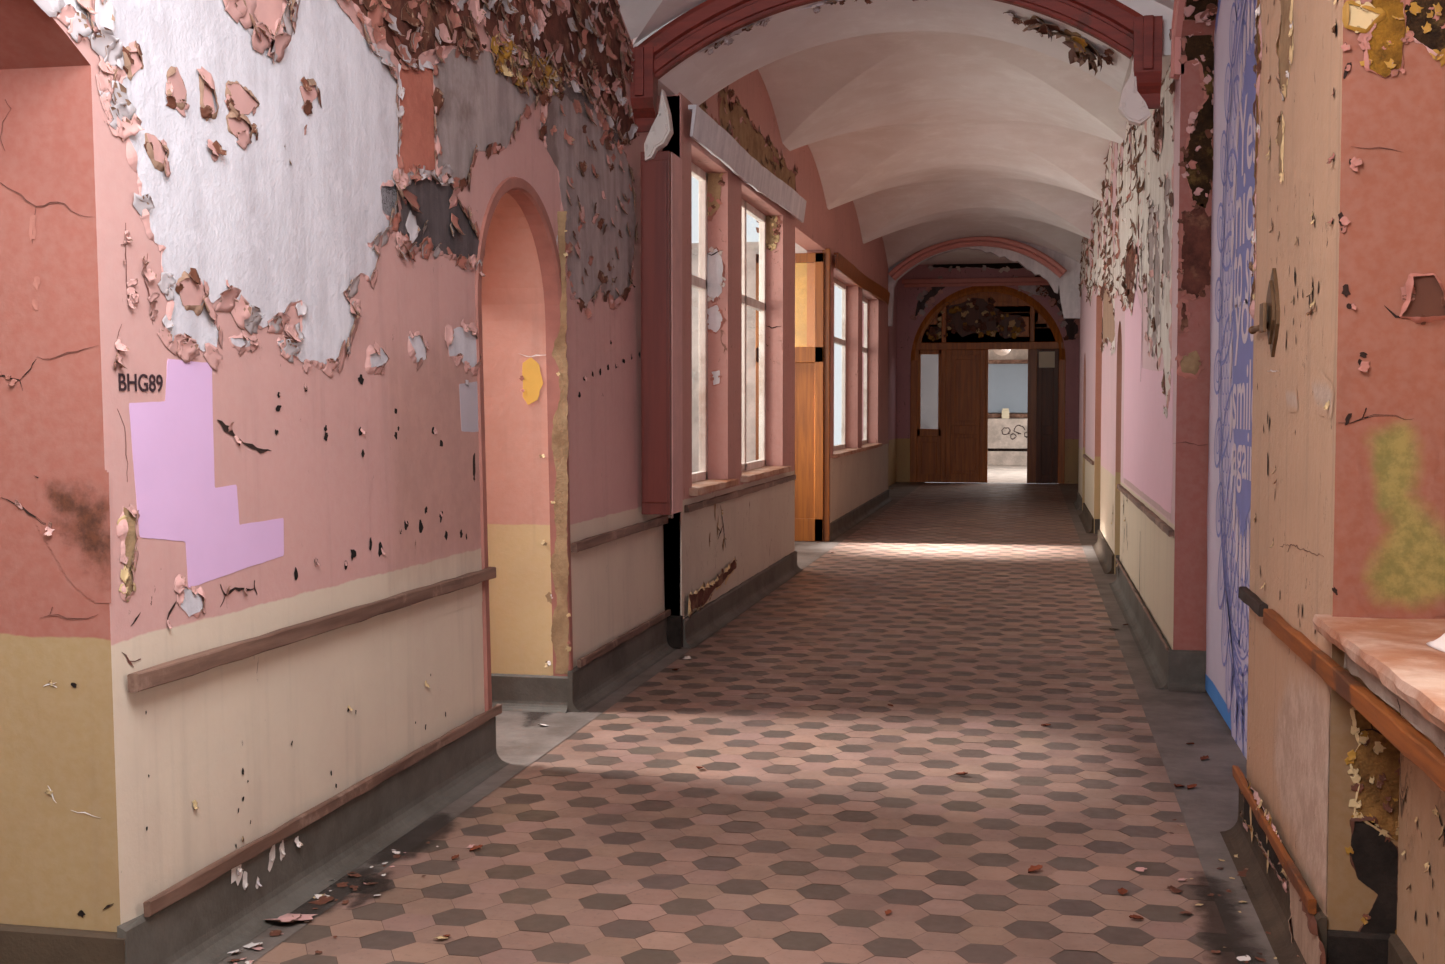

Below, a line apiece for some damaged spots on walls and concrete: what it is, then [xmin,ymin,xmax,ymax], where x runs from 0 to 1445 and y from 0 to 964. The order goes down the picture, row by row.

peeling [796,0,872,13]
peeling [1003,10,1114,75]
crack [0,99,90,244]
peeling [33,0,639,392]
peeling [1078,0,1218,418]
peeling [1310,211,1351,234]
crack [0,223,160,390]
peeling [909,263,1080,342]
peeling [1342,284,1356,310]
peeling [1358,352,1370,372]
mould [1352,409,1445,619]
peeling [1240,652,1422,934]